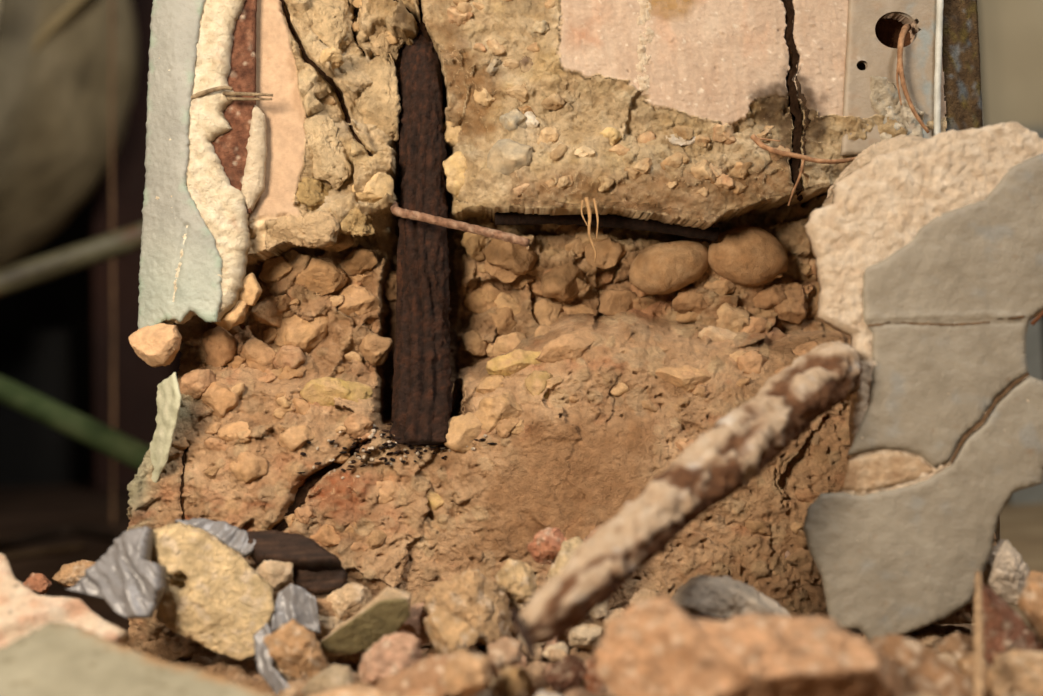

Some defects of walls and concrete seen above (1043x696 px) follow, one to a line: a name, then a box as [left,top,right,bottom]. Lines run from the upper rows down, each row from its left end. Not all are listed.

crack [280,0,372,156]
crack [394,0,431,42]
crack [785,0,803,201]
spalling [126,0,947,618]
spalling [127,610,224,660]
spalling [925,596,975,627]